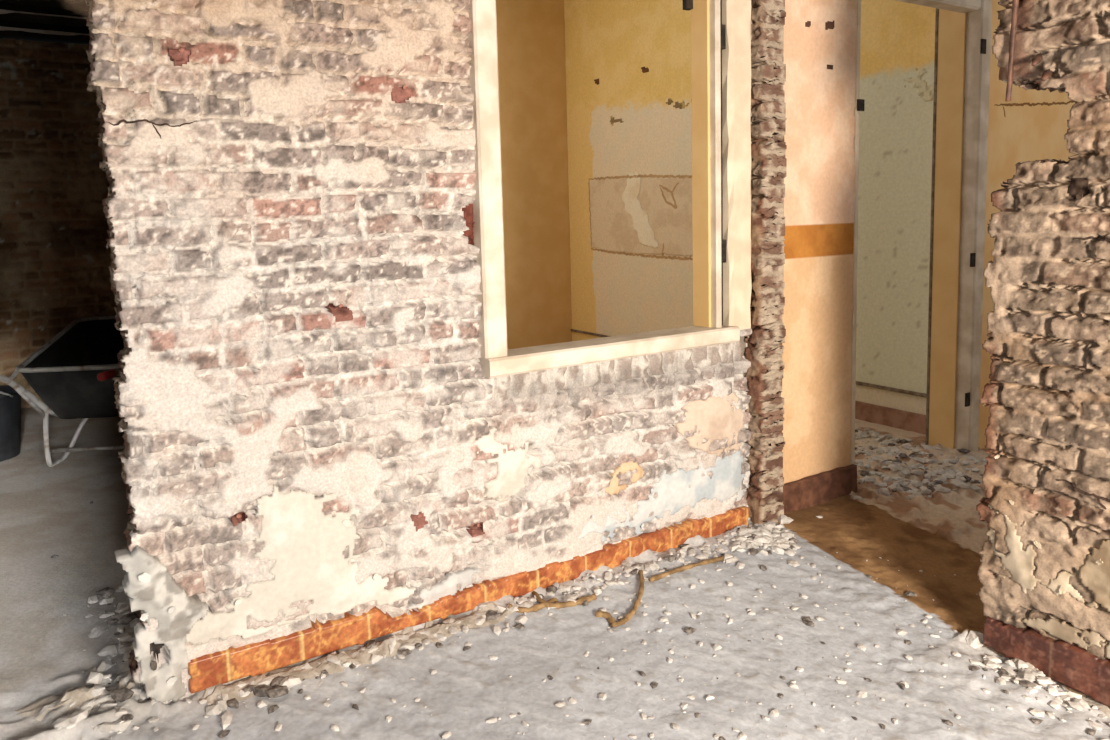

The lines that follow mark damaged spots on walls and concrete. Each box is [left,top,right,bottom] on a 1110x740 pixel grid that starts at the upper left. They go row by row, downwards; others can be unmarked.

spalling [168,47,191,66]
spalling [391,85,413,103]
peeling [666,98,692,109]
spalling [462,204,475,245]
peeling [589,172,693,257]
spalling [325,303,353,322]
flaking render [474,426,541,502]
peeling [578,392,745,542]
spalling [466,522,485,537]
flaking render [985,500,1110,612]
flaking render [114,484,482,703]
flaking render [1022,618,1110,659]